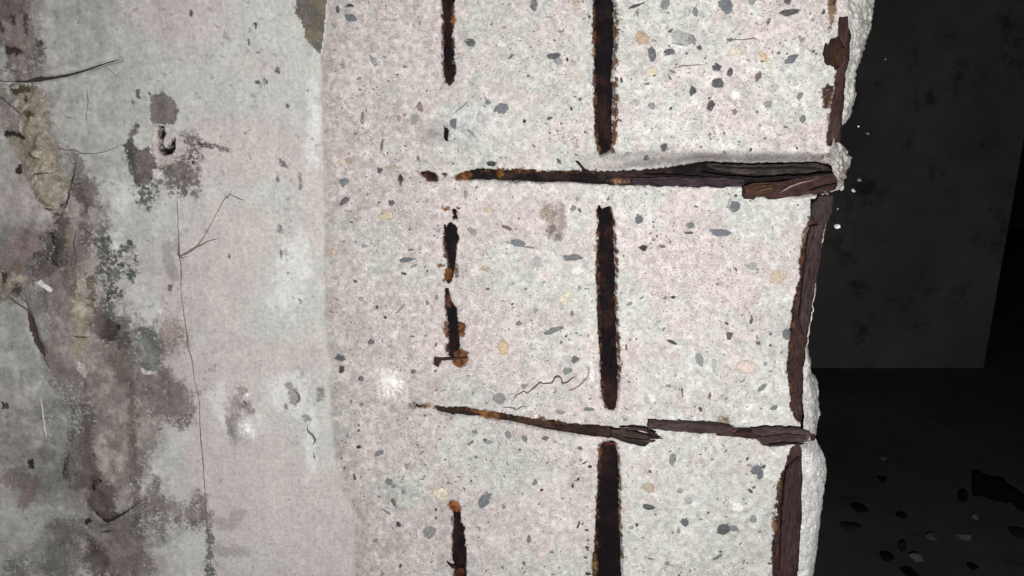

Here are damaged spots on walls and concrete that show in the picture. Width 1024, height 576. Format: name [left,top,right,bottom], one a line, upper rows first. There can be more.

crack [0,60,119,124]
rust [423,161,597,182]
spalling [295,0,875,576]
leakage [0,153,215,576]
crack [177,192,245,576]
rust [434,294,469,368]
crack [505,367,595,410]